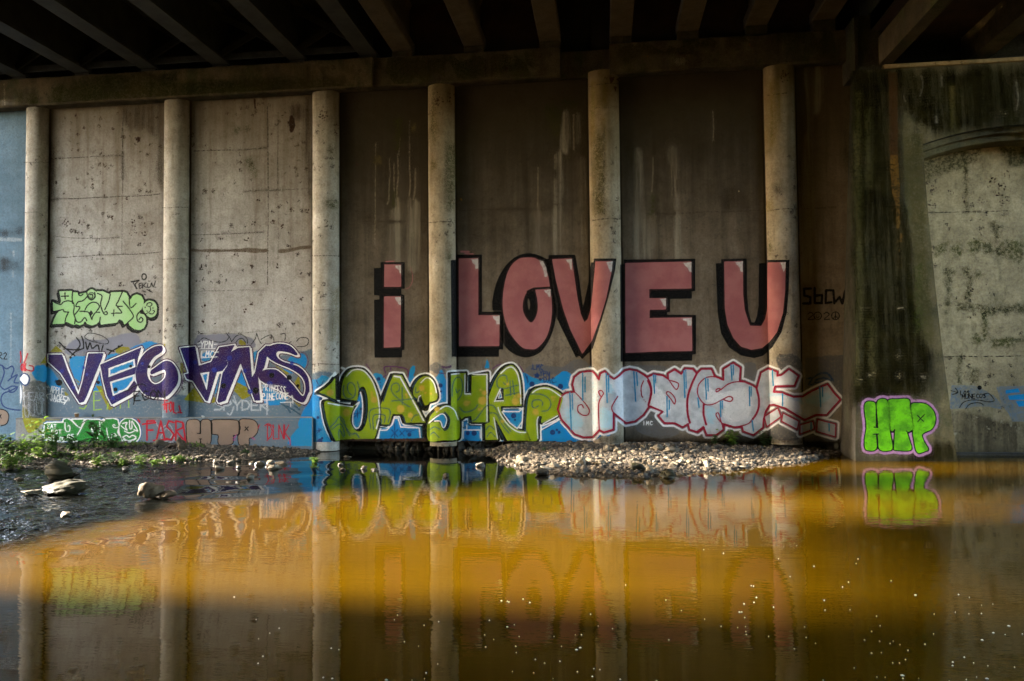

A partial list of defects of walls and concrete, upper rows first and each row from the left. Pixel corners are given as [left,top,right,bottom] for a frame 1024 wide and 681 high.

water stain [372,144,426,273]
water stain [530,77,687,260]
water stain [760,62,1024,462]